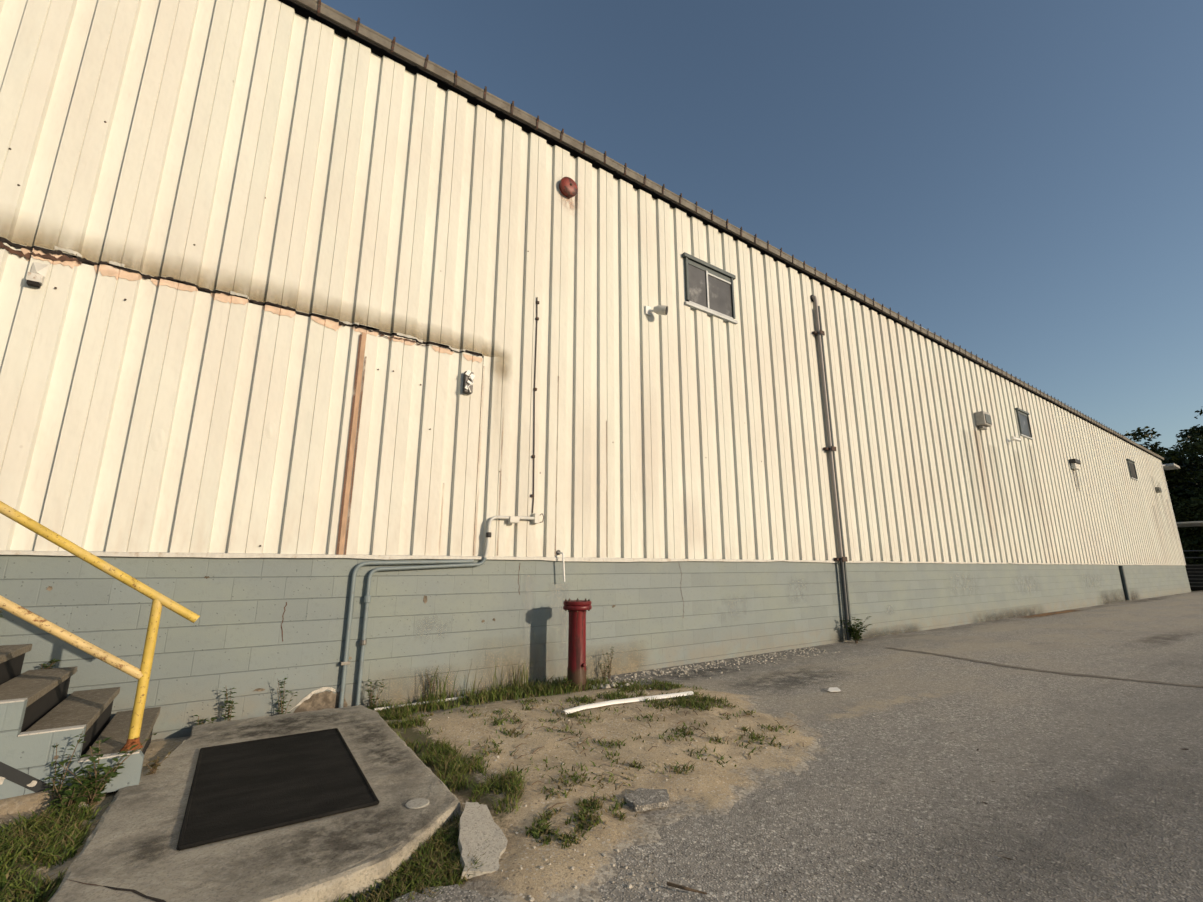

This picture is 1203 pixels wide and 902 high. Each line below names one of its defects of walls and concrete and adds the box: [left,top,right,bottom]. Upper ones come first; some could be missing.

peeling [4,242,484,363]
crack [66,879,166,902]